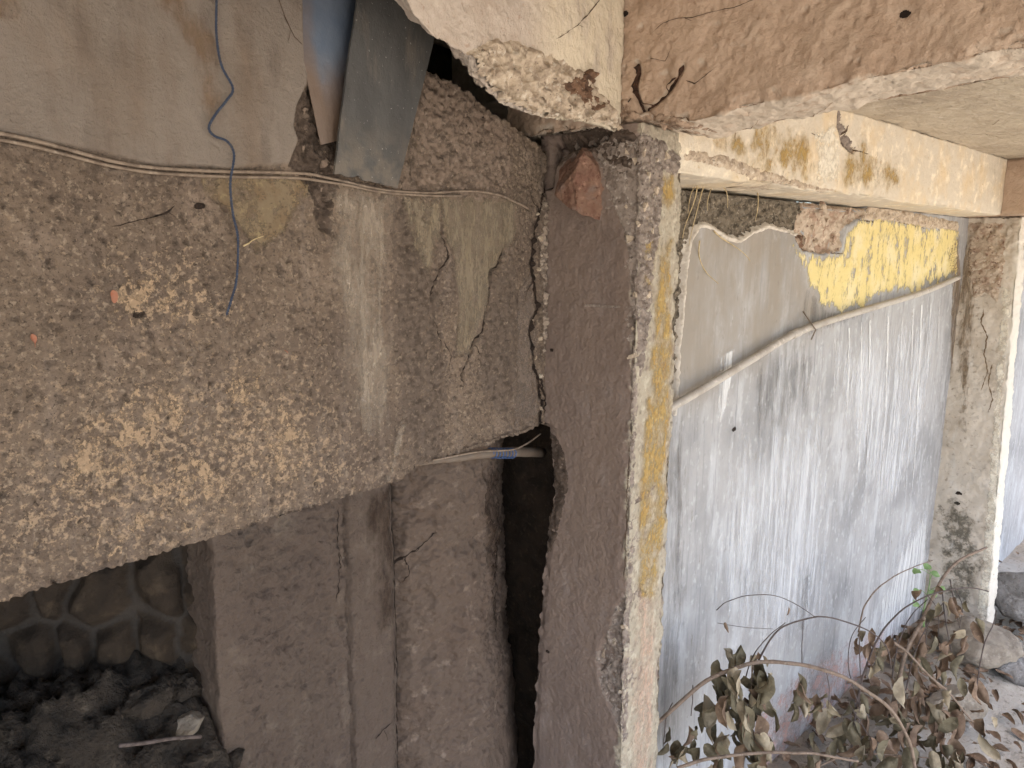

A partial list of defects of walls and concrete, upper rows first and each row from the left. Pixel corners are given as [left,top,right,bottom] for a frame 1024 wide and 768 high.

leakage [733,127,809,174]
crack [812,102,868,154]
leakage [846,144,898,184]
crack [430,234,502,381]
crack [524,188,547,424]
peeling [460,38,1010,742]
crack [980,310,993,411]
leakage [636,241,672,768]
crack [394,533,434,583]